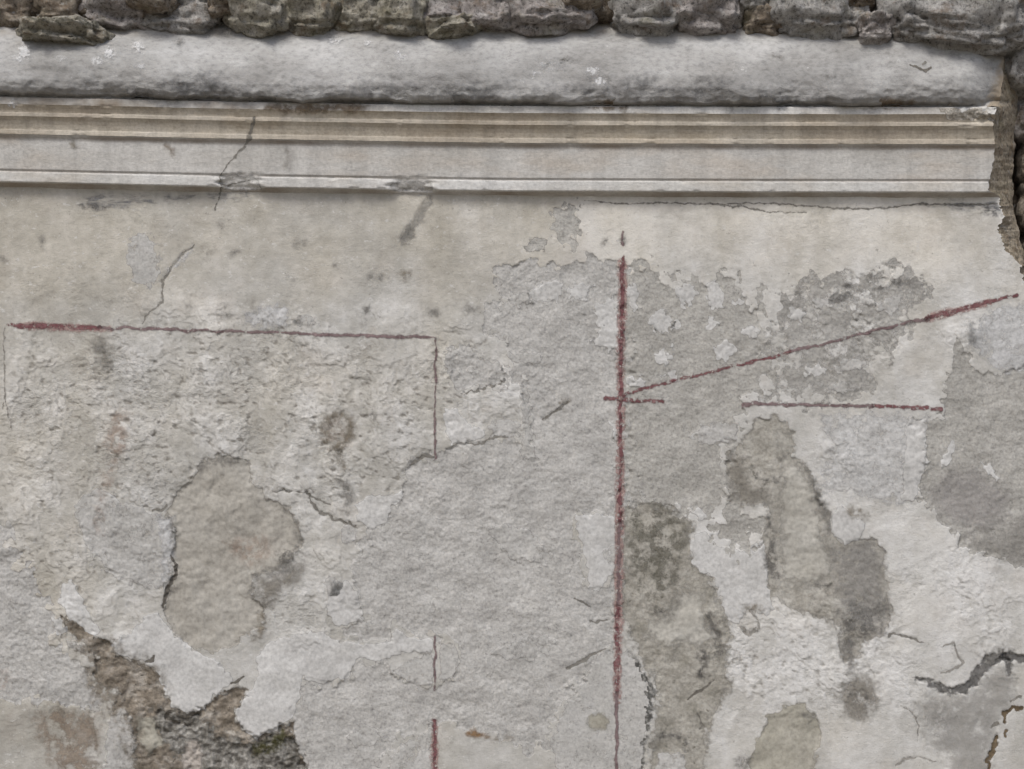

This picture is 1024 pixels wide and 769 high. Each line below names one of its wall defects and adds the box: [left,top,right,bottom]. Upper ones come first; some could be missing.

crack [214,117,255,210]
crack [142,244,195,324]
peeling [0,202,934,769]
damp [841,679,878,719]
crack [888,632,1024,769]